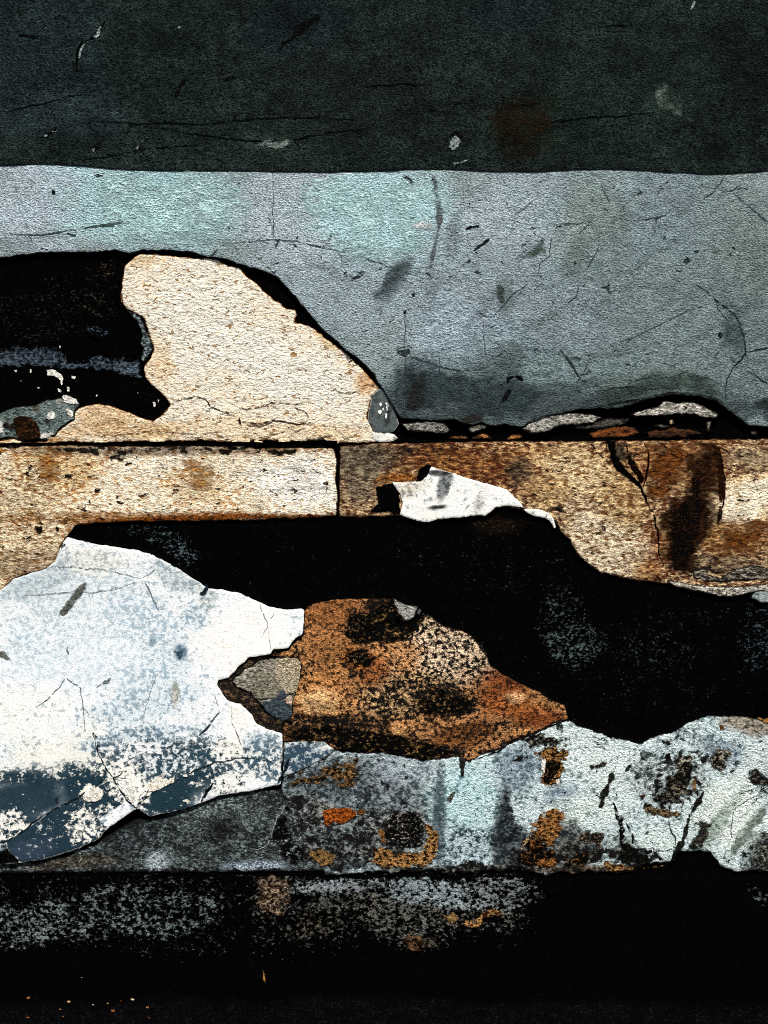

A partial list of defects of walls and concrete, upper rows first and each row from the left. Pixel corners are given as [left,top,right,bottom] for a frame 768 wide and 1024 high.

spalling [0,253,492,449]
crack [560,284,768,408]
crack [86,396,309,445]
peeling [507,400,719,440]
rust [81,512,336,525]
peeling [392,466,556,528]
crack [592,441,666,568]
rust [646,442,768,570]
crack [0,678,568,878]
peeling [0,537,570,865]
rust [372,811,439,869]
rust [519,733,569,788]